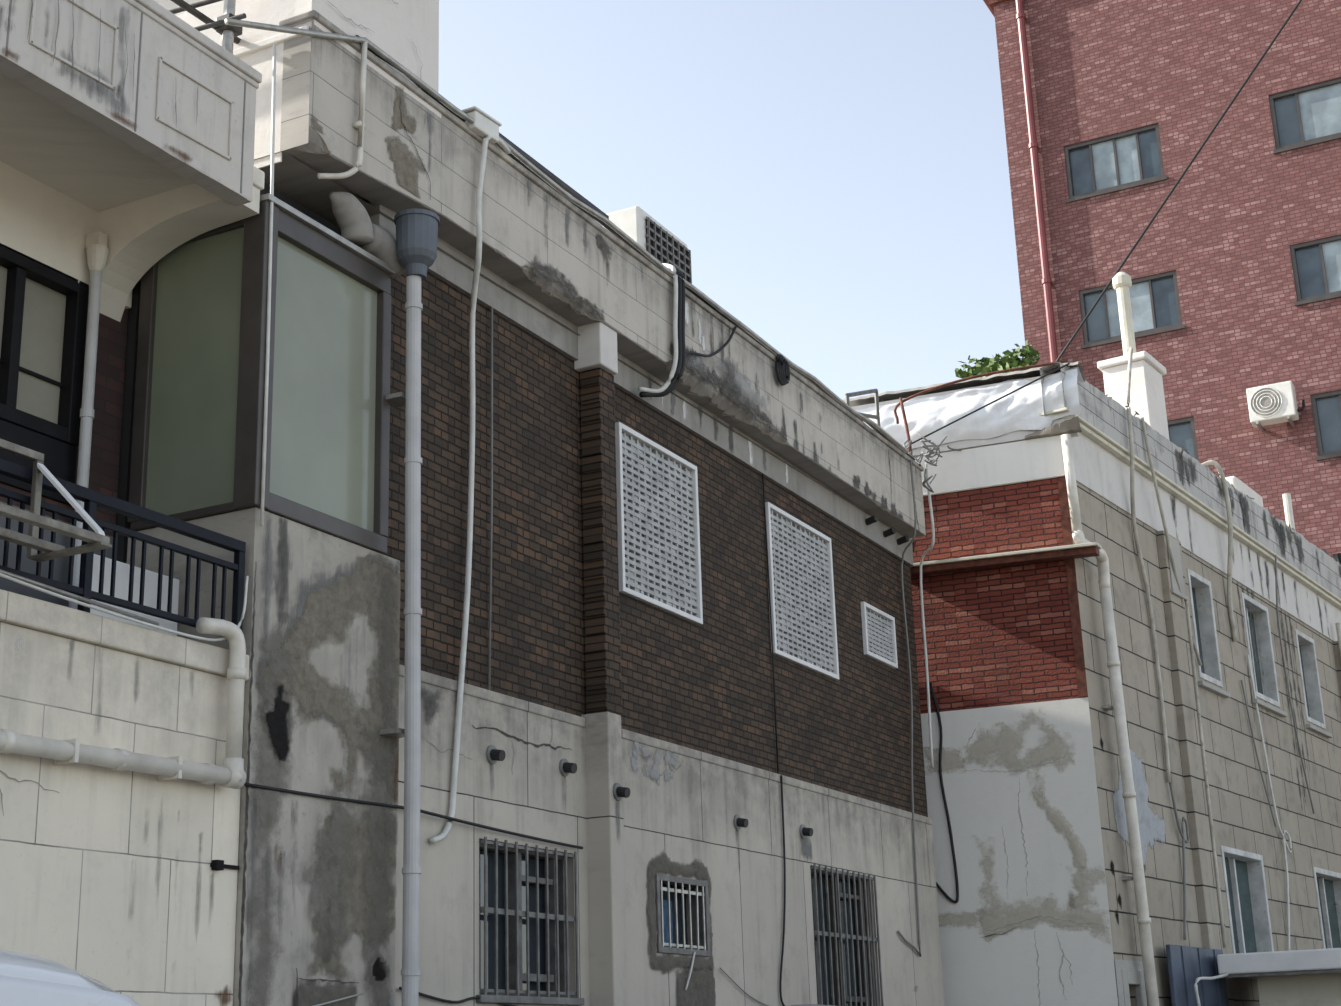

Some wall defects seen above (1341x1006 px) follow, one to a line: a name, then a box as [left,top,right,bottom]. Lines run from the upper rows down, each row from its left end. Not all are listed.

peeling [385,87,431,200]
leakage [565,212,611,272]
leakage [685,301,730,360]
leakage [649,380,766,468]
leakage [770,394,831,470]
leakage [1172,450,1196,520]
spalling [257,554,401,796]
leakage [1218,484,1320,797]
crack [0,770,60,816]
spalling [312,814,397,977]